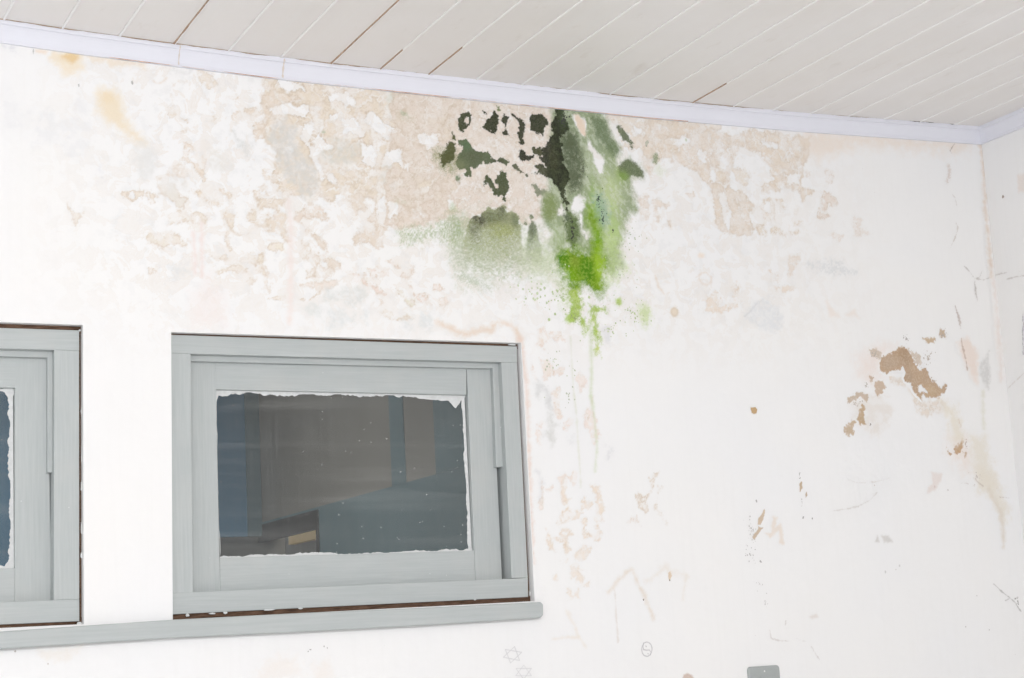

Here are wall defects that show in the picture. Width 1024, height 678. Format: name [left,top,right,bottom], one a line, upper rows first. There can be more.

peeling [106,67,549,342]
leakage [390,103,583,303]
mould [615,124,671,183]
peeling [610,115,840,239]
spalling [843,327,948,442]